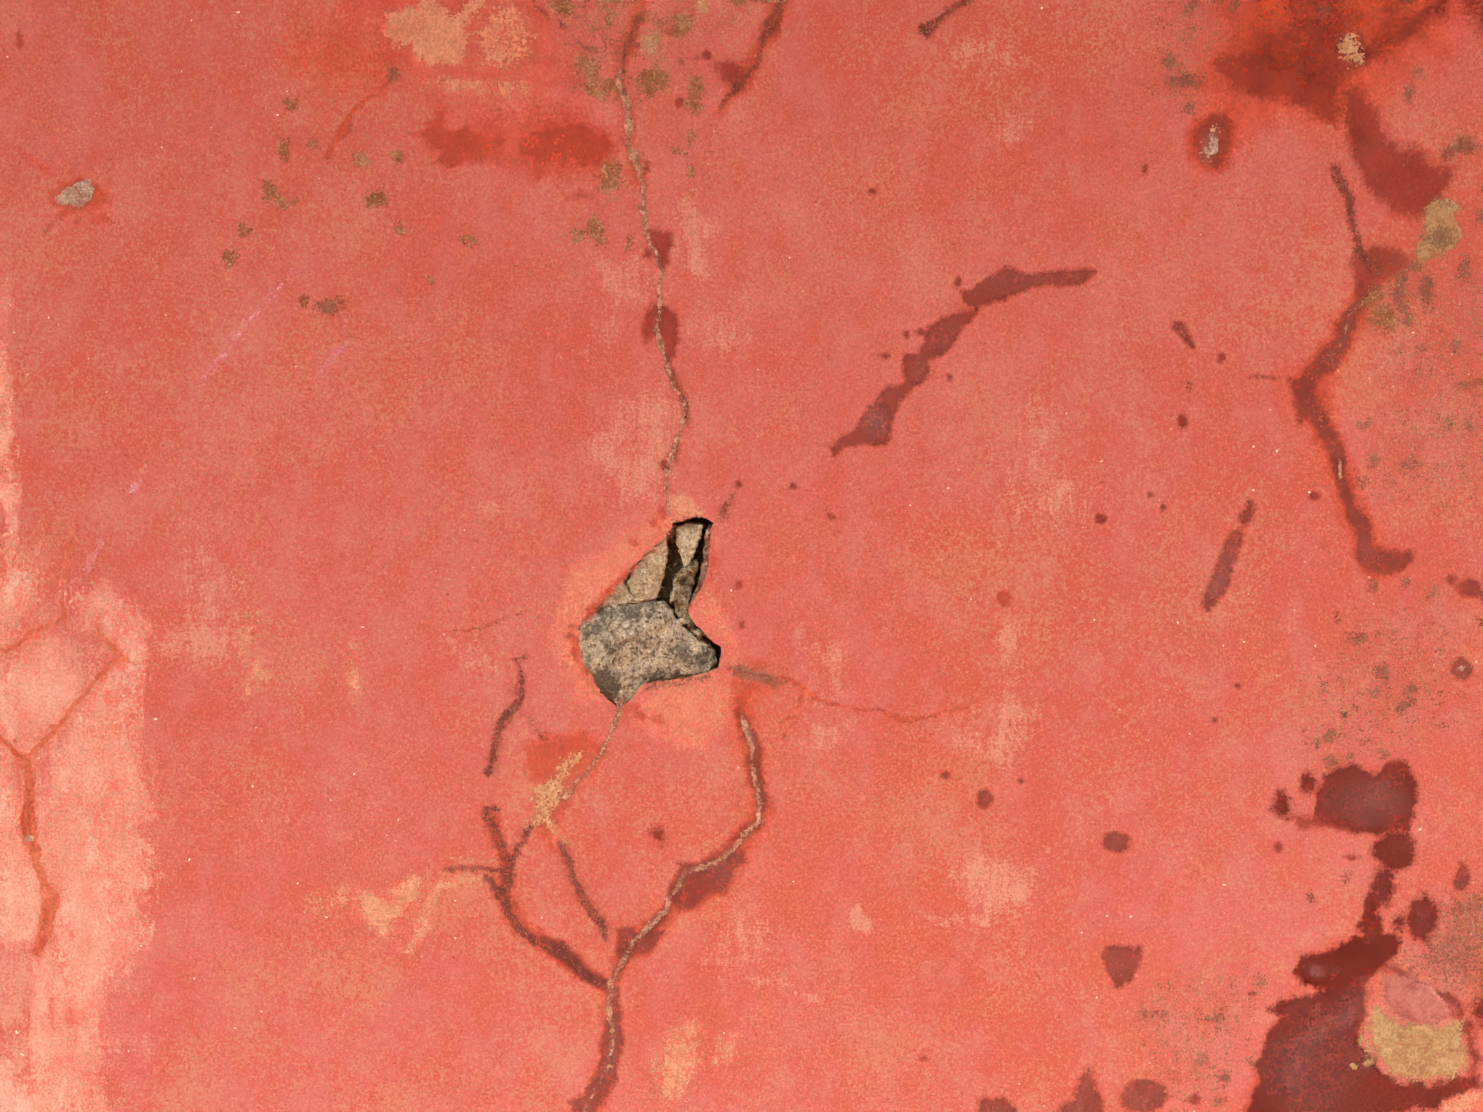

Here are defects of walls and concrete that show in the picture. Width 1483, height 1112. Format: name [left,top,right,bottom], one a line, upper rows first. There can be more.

peeling [384,0,538,99]
crack [720,0,783,106]
water stain [1148,0,1241,114]
water stain [1338,33,1364,67]
spalling [55,179,95,209]
water stain [1441,135,1482,163]
crack [534,1,689,516]
crack [1288,162,1413,575]
flaking render [550,490,735,749]
crack [445,655,969,1112]
water stain [1394,884,1483,994]
water stain [1425,1091,1483,1112]